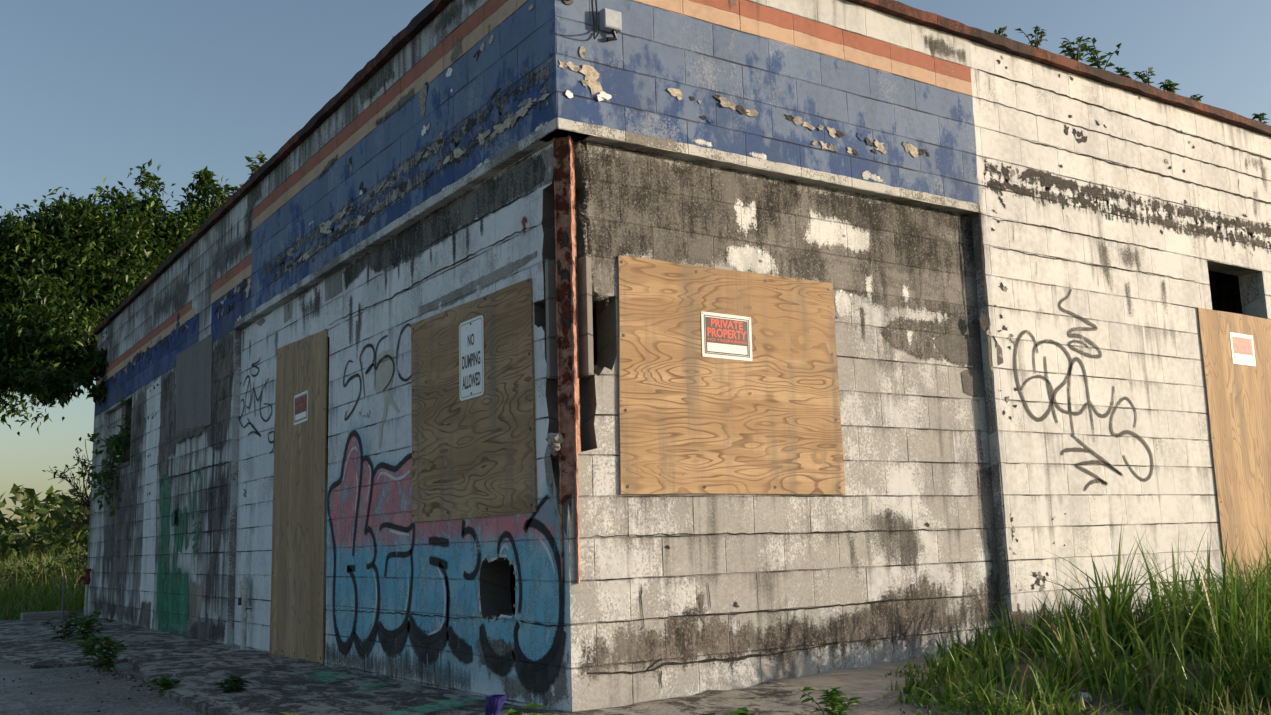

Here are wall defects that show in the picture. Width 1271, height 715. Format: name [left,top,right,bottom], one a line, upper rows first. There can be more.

peeling [207,46,612,495]
corrosion [557,212,573,406]
peeling [667,88,758,123]
leakage [589,147,974,315]
peeling [574,141,1022,420]
peeling [785,114,887,155]
peeling [1064,115,1087,143]
leakage [1096,241,1143,314]
peeling [981,158,1271,255]
leakage [1246,153,1268,214]
leakage [93,386,231,643]
leakage [574,429,1055,686]